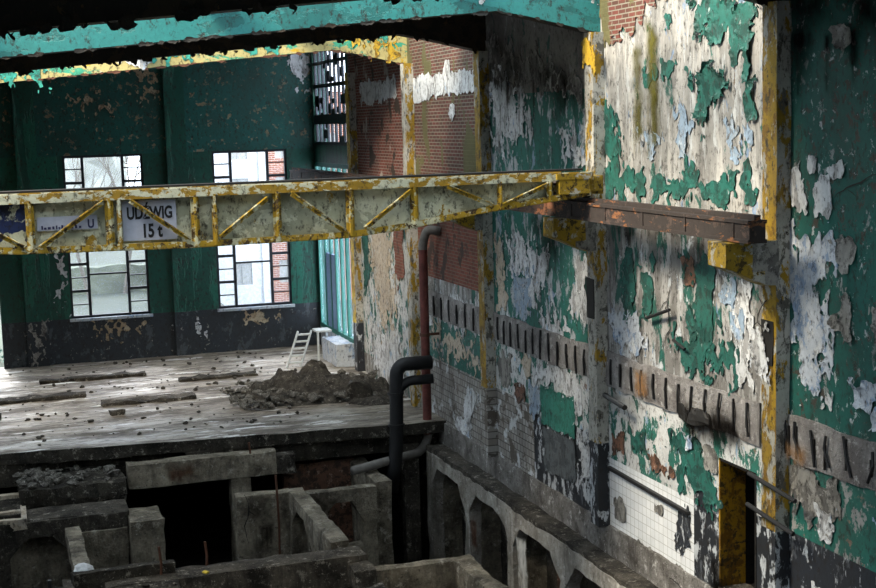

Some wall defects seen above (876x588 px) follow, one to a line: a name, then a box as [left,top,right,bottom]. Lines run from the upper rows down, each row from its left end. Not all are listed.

peeling [103,12,138,31]
peeling [174,7,212,22]
peeling [0,16,421,108]
peeling [472,0,672,170]
peeling [604,0,778,211]
spalling [125,475,230,515]
spalling [251,474,282,492]
peeling [361,230,405,384]
peeling [493,224,590,485]
peeling [608,246,771,570]
peeling [789,155,857,412]
peeling [847,377,876,432]